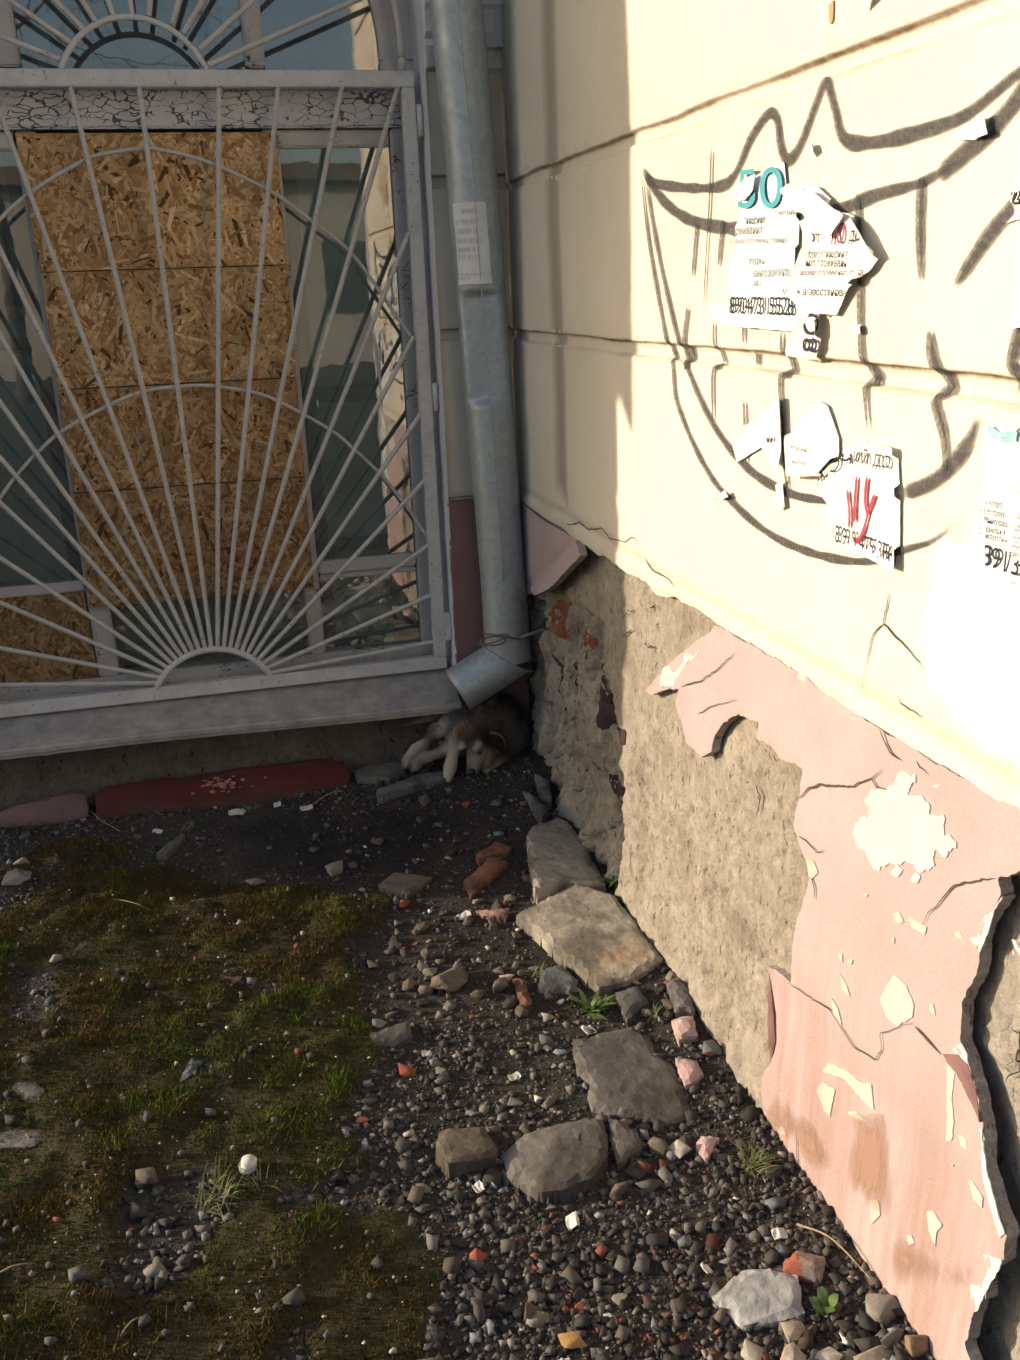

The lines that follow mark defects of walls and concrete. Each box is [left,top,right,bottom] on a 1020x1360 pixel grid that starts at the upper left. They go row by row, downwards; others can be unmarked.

crack [860,594,925,691]
crack [797,729,929,799]
spalling [527,546,818,1113]
peeling [852,770,957,883]
crack [798,836,824,899]
peeling [891,911,927,944]
peeling [831,954,853,1025]
peeling [880,975,936,1026]
peeling [817,1062,875,1133]
spalling [943,875,1020,1360]
peeling [869,1199,881,1224]
peeling [926,1210,943,1246]